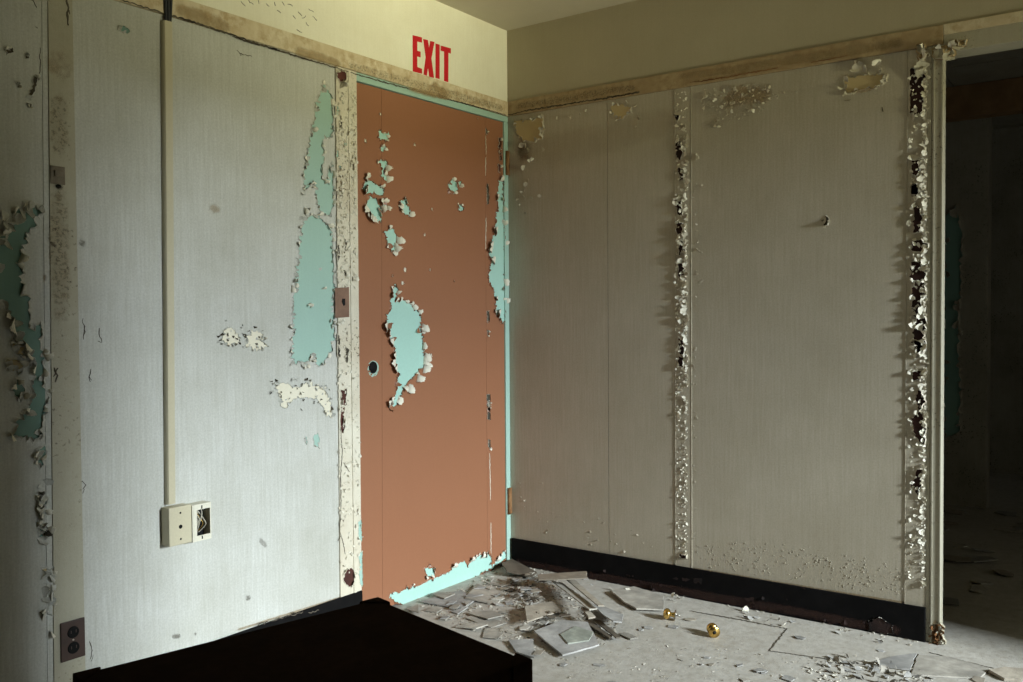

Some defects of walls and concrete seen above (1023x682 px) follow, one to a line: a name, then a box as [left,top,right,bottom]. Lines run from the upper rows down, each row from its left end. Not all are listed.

peeling [513,114,546,171]
peeling [837,59,889,101]
peeling [0,200,56,545]
peeling [217,320,269,352]
peeling [269,69,416,588]
peeling [384,268,433,412]
peeling [487,175,511,325]
peeling [672,92,699,560]
peeling [906,39,968,588]
peeling [40,566,57,620]
peeling [388,550,900,635]
rust [928,622,947,645]